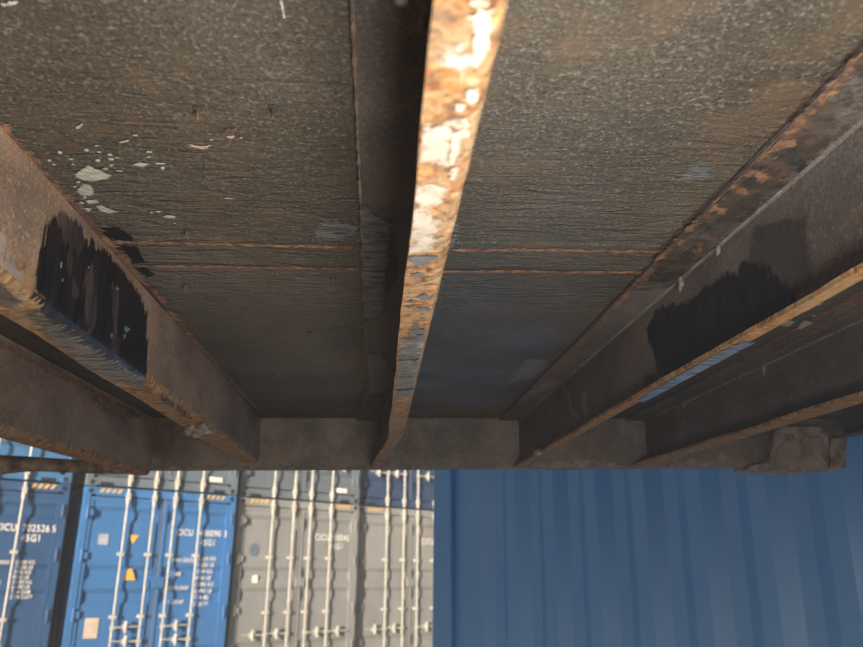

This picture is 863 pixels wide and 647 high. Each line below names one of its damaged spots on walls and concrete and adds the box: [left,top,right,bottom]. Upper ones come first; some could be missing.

peeling [467,0,496,68]
peeling [448,89,478,180]
peeling [48,145,122,213]
rust [443,42,863,381]
spalling [409,256,439,278]